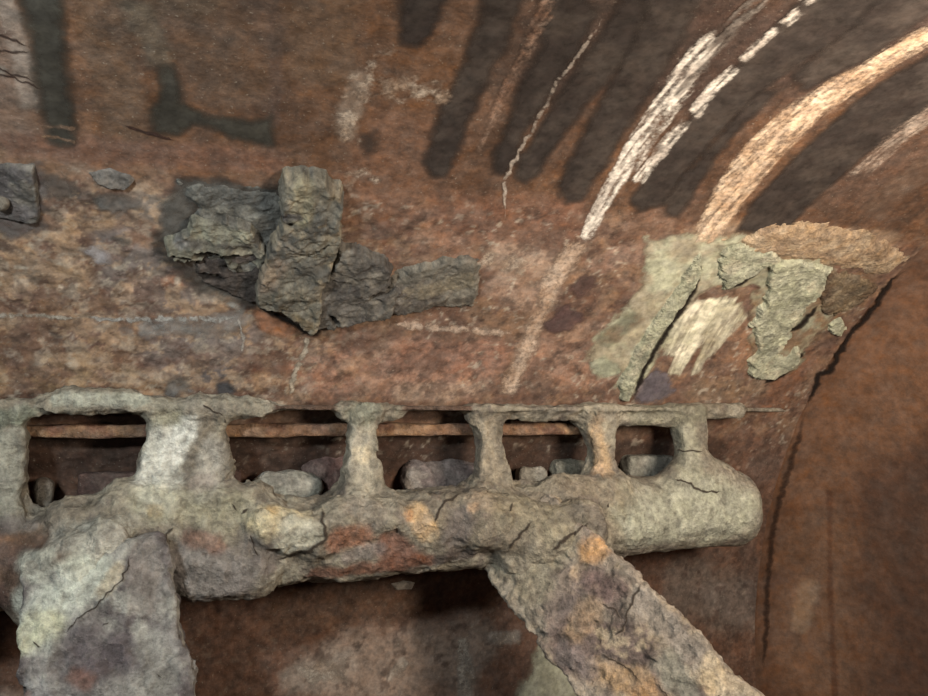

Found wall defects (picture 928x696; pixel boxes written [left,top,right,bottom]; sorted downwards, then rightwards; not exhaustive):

crack [0,34,36,88]
water stain [19,0,76,147]
water stain [151,65,274,146]
water stain [399,0,446,48]
water stain [422,0,523,177]
water stain [493,0,928,403]